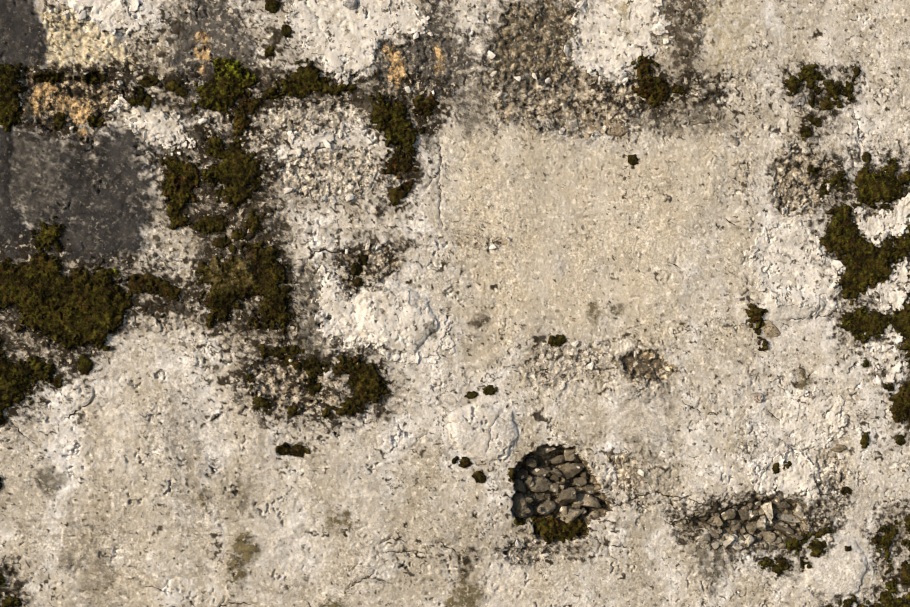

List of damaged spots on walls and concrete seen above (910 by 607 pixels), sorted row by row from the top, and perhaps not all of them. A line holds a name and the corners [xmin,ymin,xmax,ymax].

leakage [166,0,255,121]
leakage [650,0,705,77]
leakage [195,176,277,252]
leakage [373,187,392,219]
leakage [389,232,431,251]
leakage [281,273,326,363]
leakage [467,315,491,338]
spalling [497,444,613,571]
spalling [607,452,648,495]
spalling [670,387,857,551]